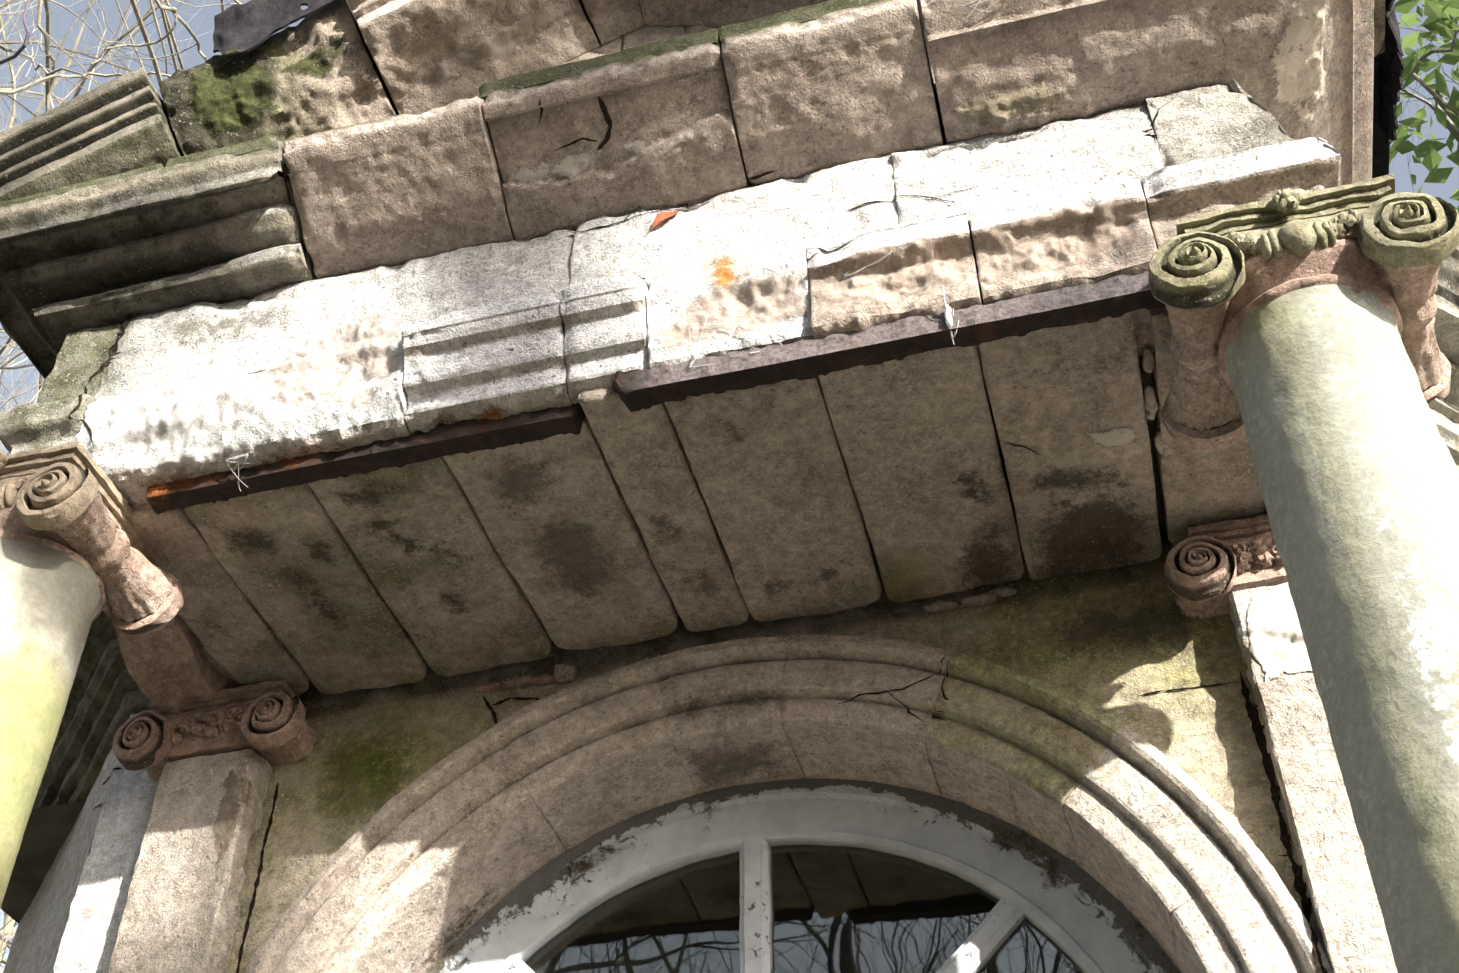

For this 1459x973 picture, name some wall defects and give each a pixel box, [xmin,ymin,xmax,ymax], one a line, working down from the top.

crack [539,93,612,151]
spalling [1269,0,1329,124]
crack [844,186,978,211]
rust [713,256,739,287]
crack [69,314,131,448]
rust [147,477,208,506]
damp [487,460,614,596]
damp [954,467,1201,657]
peeling [1246,588,1312,683]
crack [236,782,279,973]
damp [320,740,397,817]
crack [1139,670,1328,973]